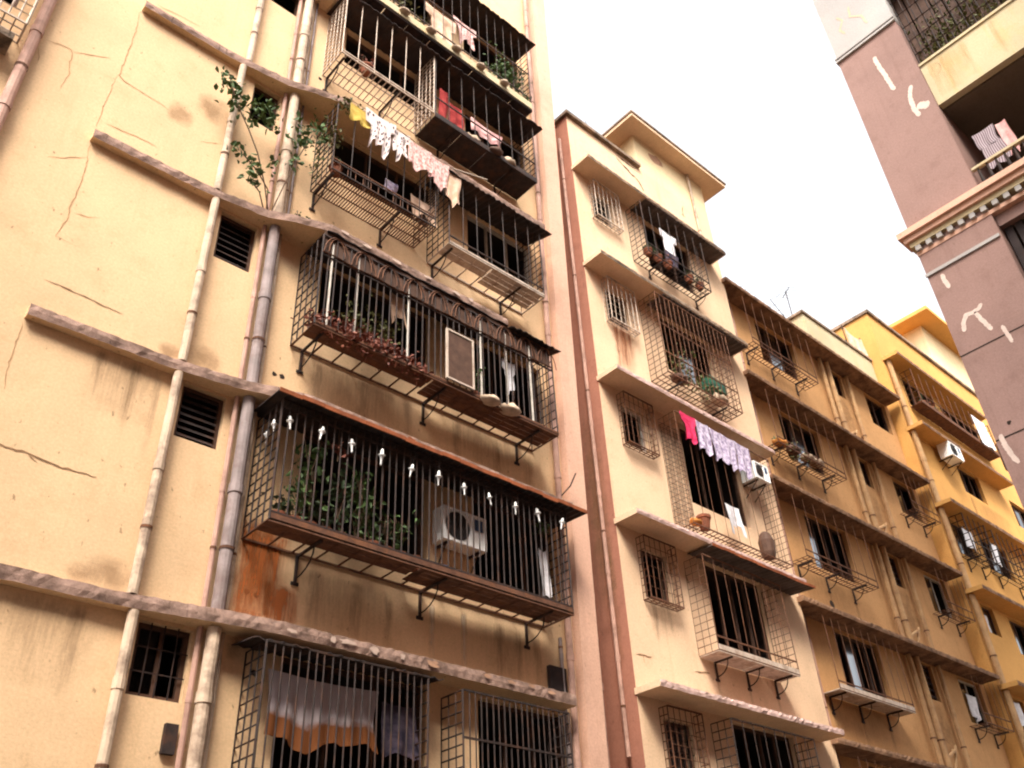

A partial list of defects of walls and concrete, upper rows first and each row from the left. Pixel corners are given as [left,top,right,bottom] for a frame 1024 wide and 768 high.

crack [37,5,199,246]
crack [47,280,122,314]
crack [4,323,23,389]
crack [0,444,95,477]
rust [237,524,294,622]